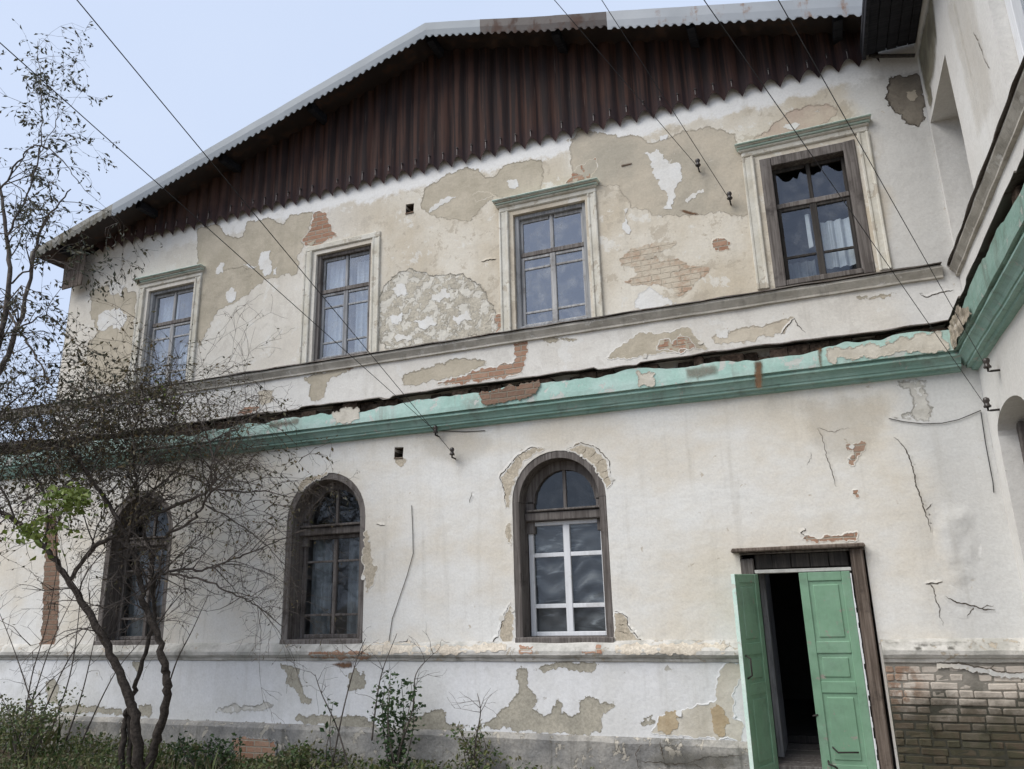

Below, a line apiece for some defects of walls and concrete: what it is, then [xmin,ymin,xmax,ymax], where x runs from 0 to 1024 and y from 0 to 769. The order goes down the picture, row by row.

flaking render [884,73,926,127]
flaking render [420,159,544,222]
flaking render [196,210,338,347]
flaking render [379,267,501,349]
flaking render [619,241,710,296]
flaking render [401,341,540,406]
flaking render [500,446,545,546]
crack [809,428,846,486]
crack [894,435,933,532]
crack [925,579,996,623]
peeling [308,603,615,736]
flaking render [613,612,745,742]